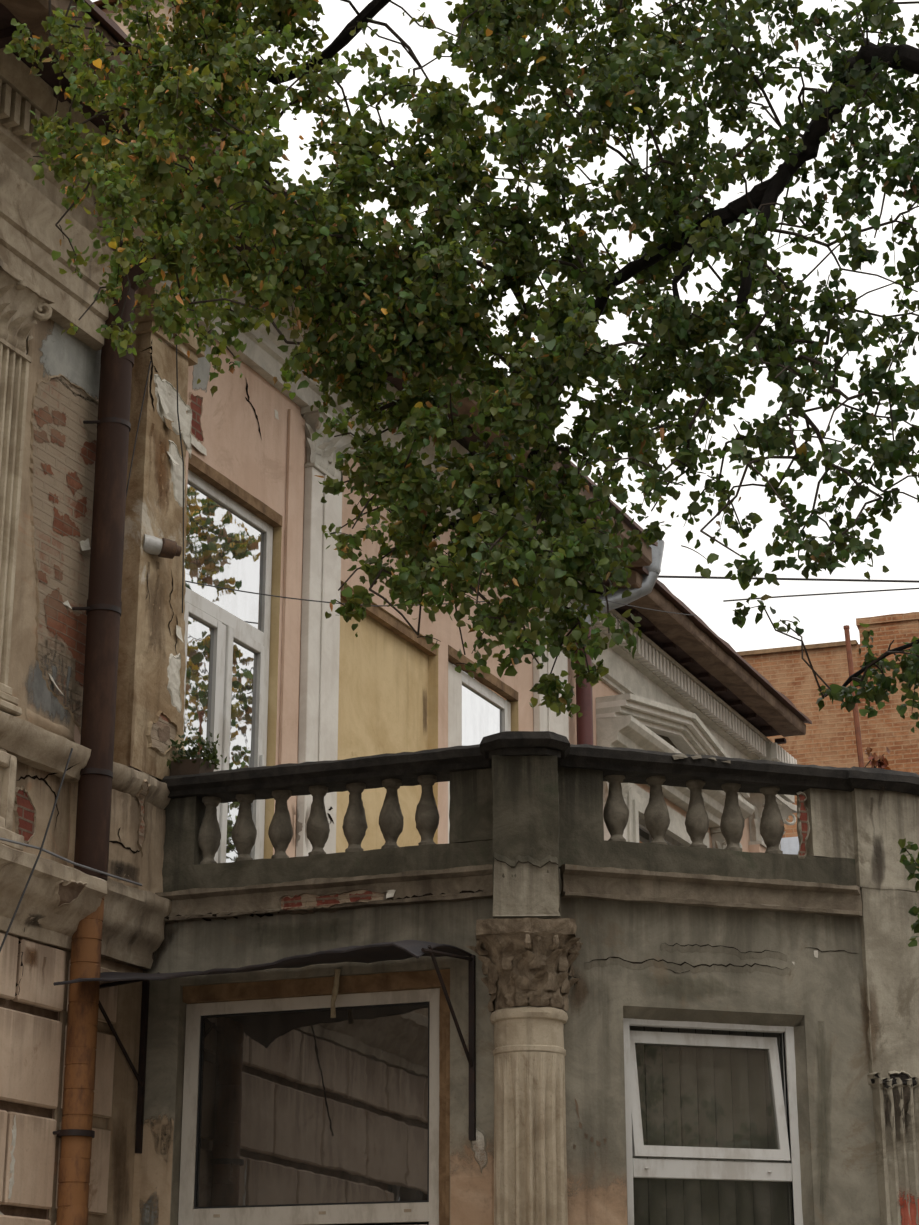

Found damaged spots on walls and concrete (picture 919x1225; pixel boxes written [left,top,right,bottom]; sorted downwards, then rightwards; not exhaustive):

crack [245,380,262,440]
flaking render [29,374,98,735]
flaking render [13,785,36,844]
crack [17,763,79,827]
flaking render [278,889,396,915]
crack [584,943,857,976]
leakage [884,1083,911,1133]